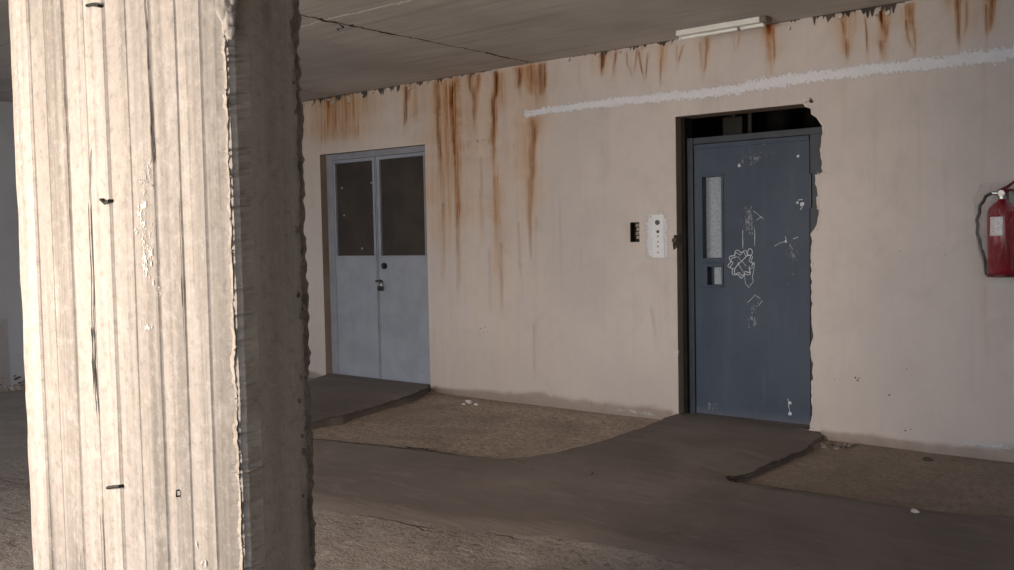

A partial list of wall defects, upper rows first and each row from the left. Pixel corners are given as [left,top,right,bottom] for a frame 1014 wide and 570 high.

spalling [803,97,826,430]